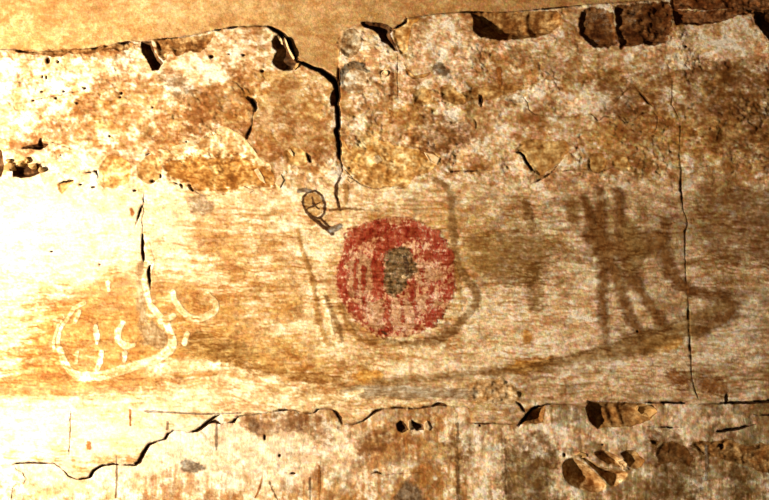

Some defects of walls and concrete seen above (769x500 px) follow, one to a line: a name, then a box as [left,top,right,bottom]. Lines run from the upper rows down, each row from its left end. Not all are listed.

spalling [471,11,561,40]
spalling [578,0,769,50]
hole [272,34,300,71]
crack [268,26,398,190]
spalling [0,138,48,178]
crack [518,86,711,233]
spalling [586,402,658,429]
crack [11,402,560,496]
spalling [562,444,645,492]
spalling [650,438,769,473]